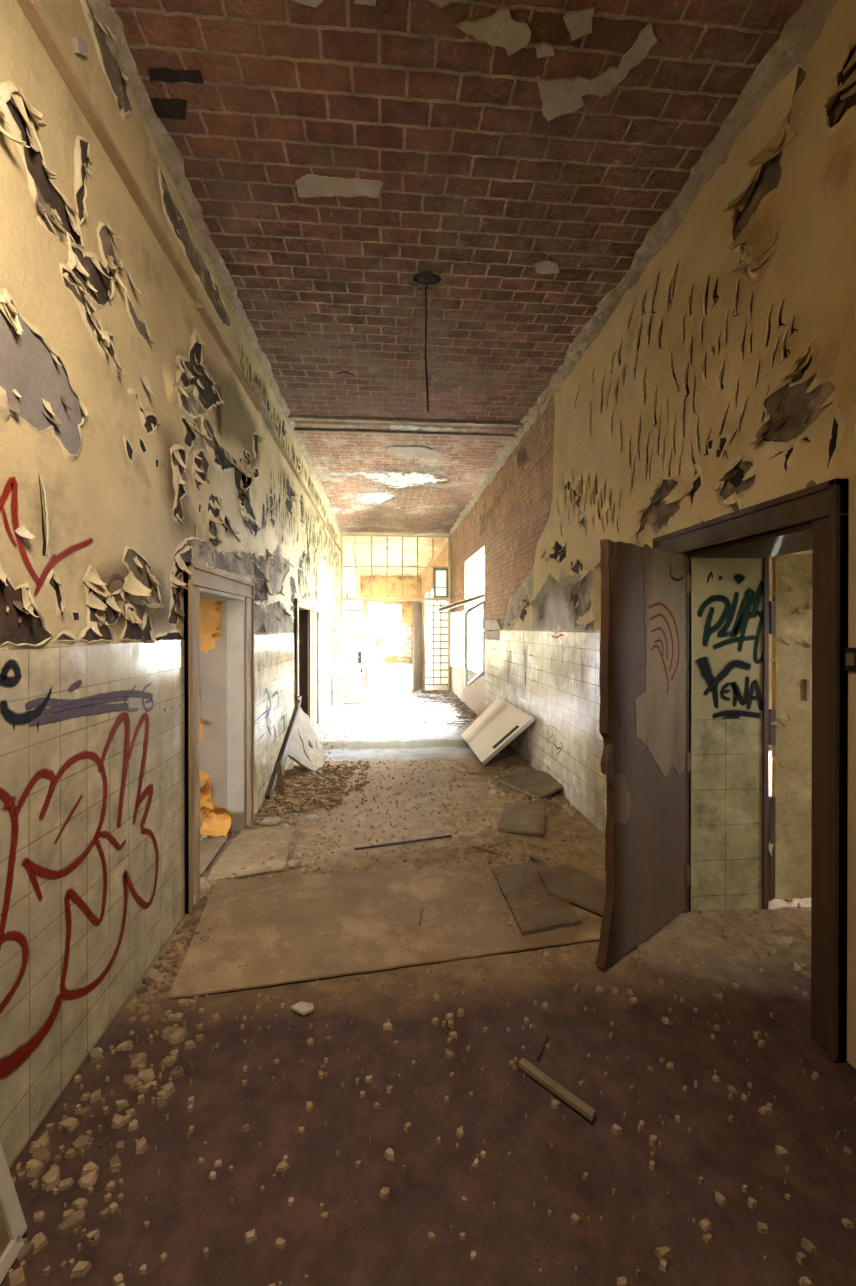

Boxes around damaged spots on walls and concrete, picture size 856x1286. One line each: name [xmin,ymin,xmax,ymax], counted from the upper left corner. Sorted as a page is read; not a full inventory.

spalling [148,67,204,120]
peeling [721,60,808,273]
peeling [824,43,856,136]
peeling [0,81,308,653]
leakage [241,353,447,720]
flaking render [633,340,847,544]